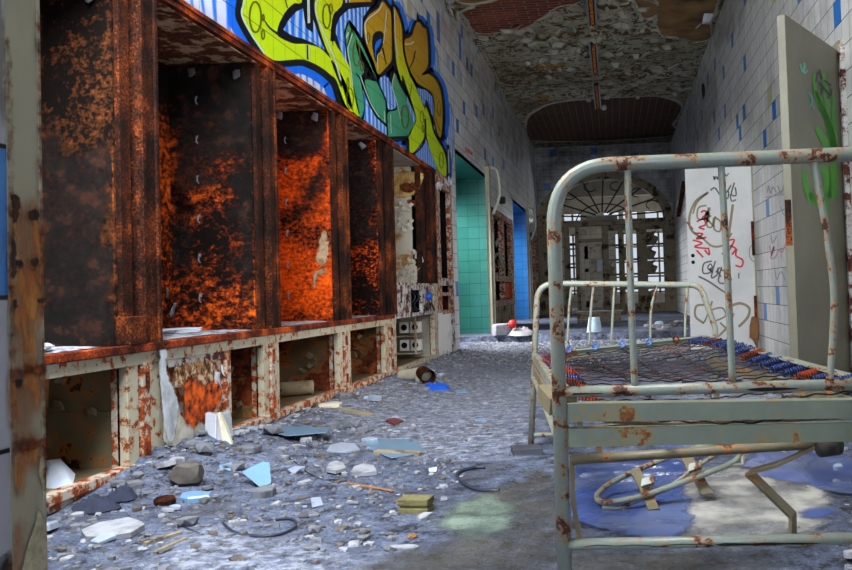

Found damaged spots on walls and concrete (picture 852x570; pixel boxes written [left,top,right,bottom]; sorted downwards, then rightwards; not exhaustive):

spalling [445,0,721,142]
corrosion [9,191,395,491]